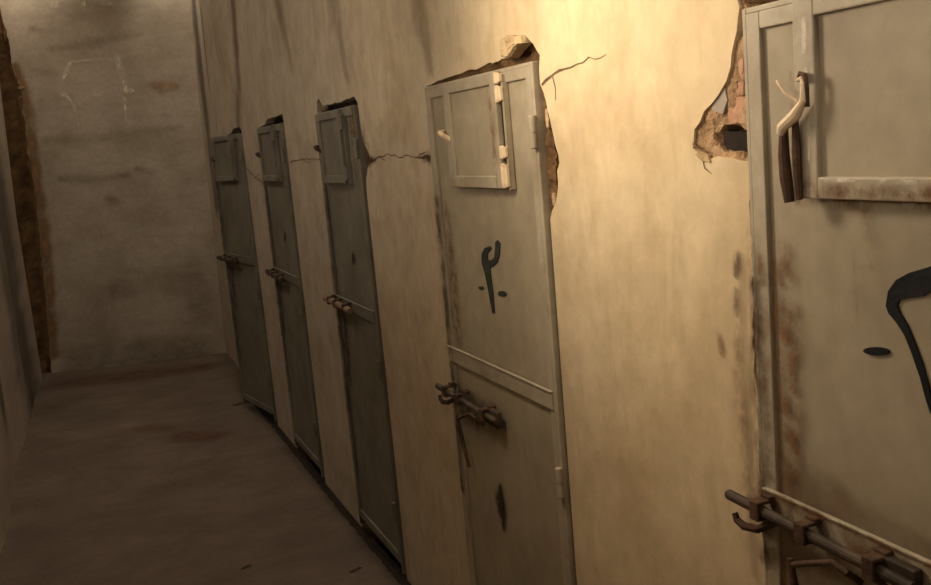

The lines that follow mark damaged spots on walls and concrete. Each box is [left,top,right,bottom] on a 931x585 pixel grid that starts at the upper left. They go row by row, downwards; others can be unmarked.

peeling [0,10,56,373]
crack [368,152,430,163]
flaking render [541,88,559,214]
crack [541,54,606,100]
flaking render [692,37,748,174]
rust [750,258,763,358]